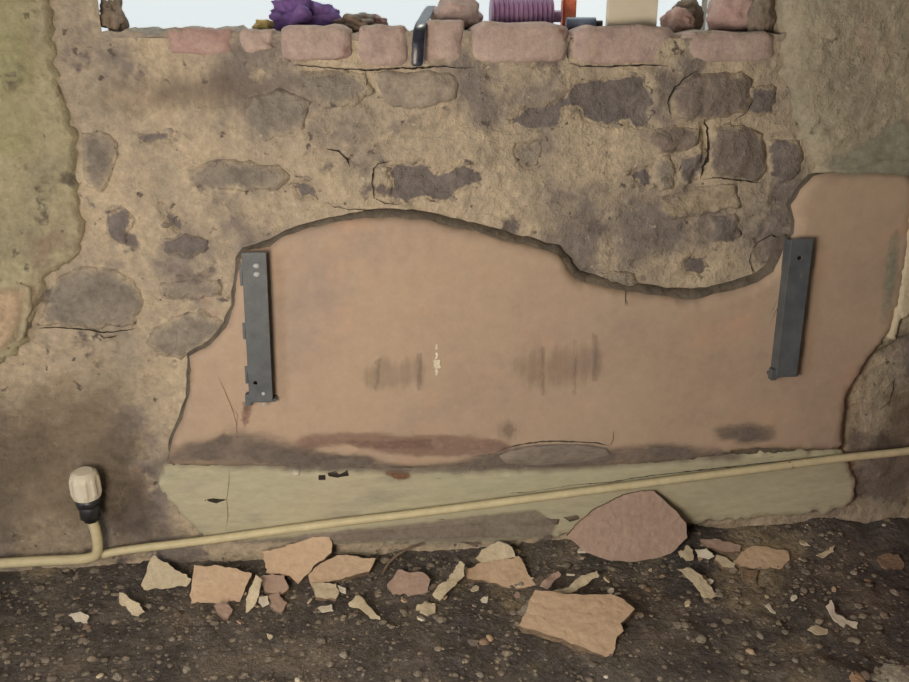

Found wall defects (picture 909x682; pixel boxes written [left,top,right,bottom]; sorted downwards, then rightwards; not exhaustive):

flaking render [81,130,119,193]
flaking render [188,159,321,200]
flaking render [243,70,376,142]
spalling [381,160,482,207]
spalling [503,71,804,193]
flaking render [105,206,136,245]
flaking render [153,201,209,259]
flaking render [146,279,223,360]
leakage [0,396,149,535]
leakage [168,435,736,473]
leakage [719,426,770,441]
leakage [870,394,909,485]